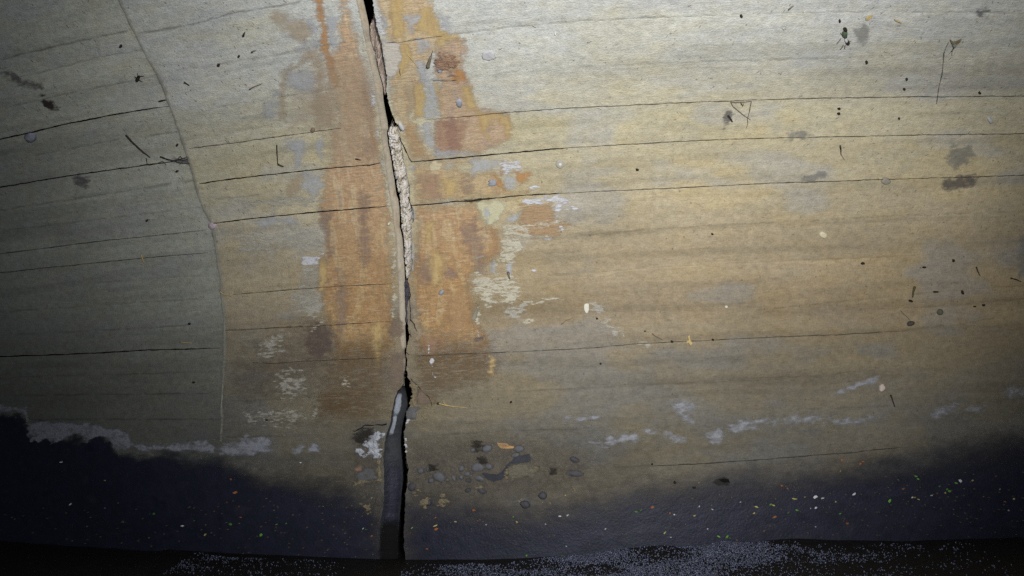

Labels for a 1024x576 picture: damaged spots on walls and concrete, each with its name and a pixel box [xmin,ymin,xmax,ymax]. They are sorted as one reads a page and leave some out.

corrosion [306,0,393,360]
water stain [405,38,453,171]
corrosion [377,0,570,358]
water stain [470,154,521,189]
water stain [470,184,578,335]
crack [199,0,1024,559]
water stain [0,367,380,559]